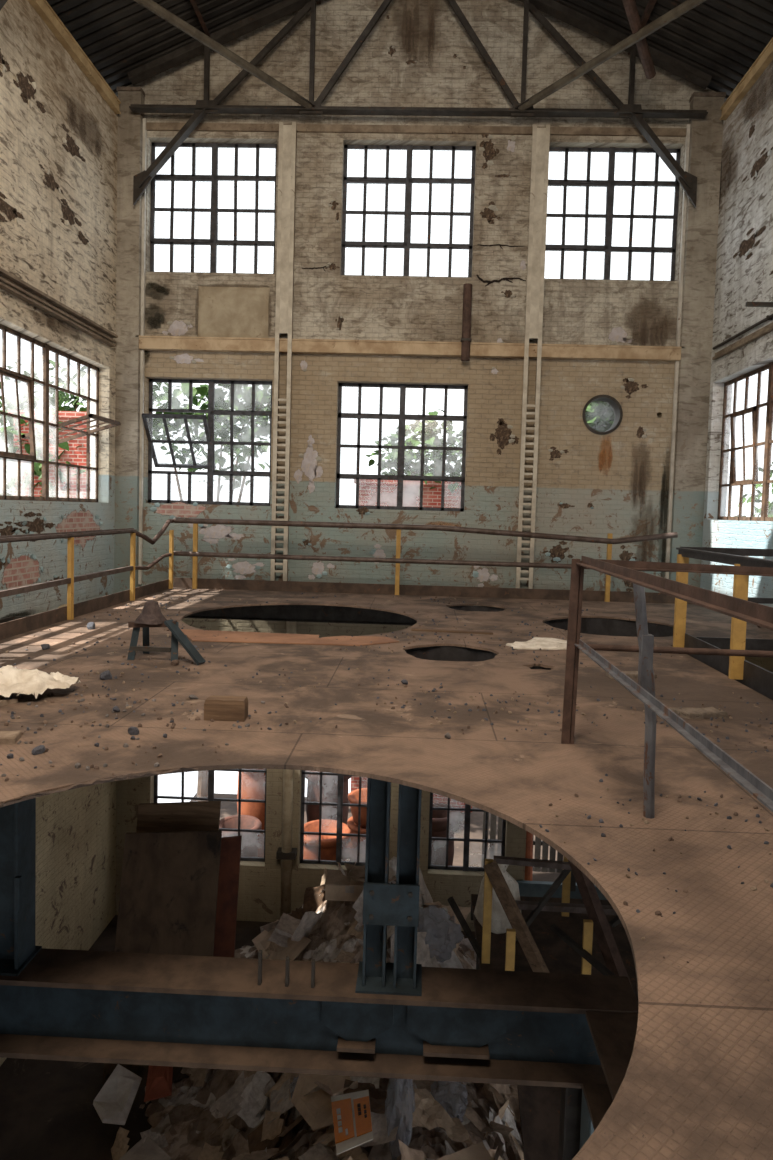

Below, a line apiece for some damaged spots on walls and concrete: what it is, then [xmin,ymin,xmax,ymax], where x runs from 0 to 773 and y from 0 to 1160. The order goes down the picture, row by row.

peeling [0,48,46,113]
peeling [62,124,86,162]
peeling [742,147,773,182]
peeling [0,192,25,224]
peeling [39,164,90,246]
peeling [733,225,766,260]
peeling [490,418,519,455]
flaking render [0,510,103,596]